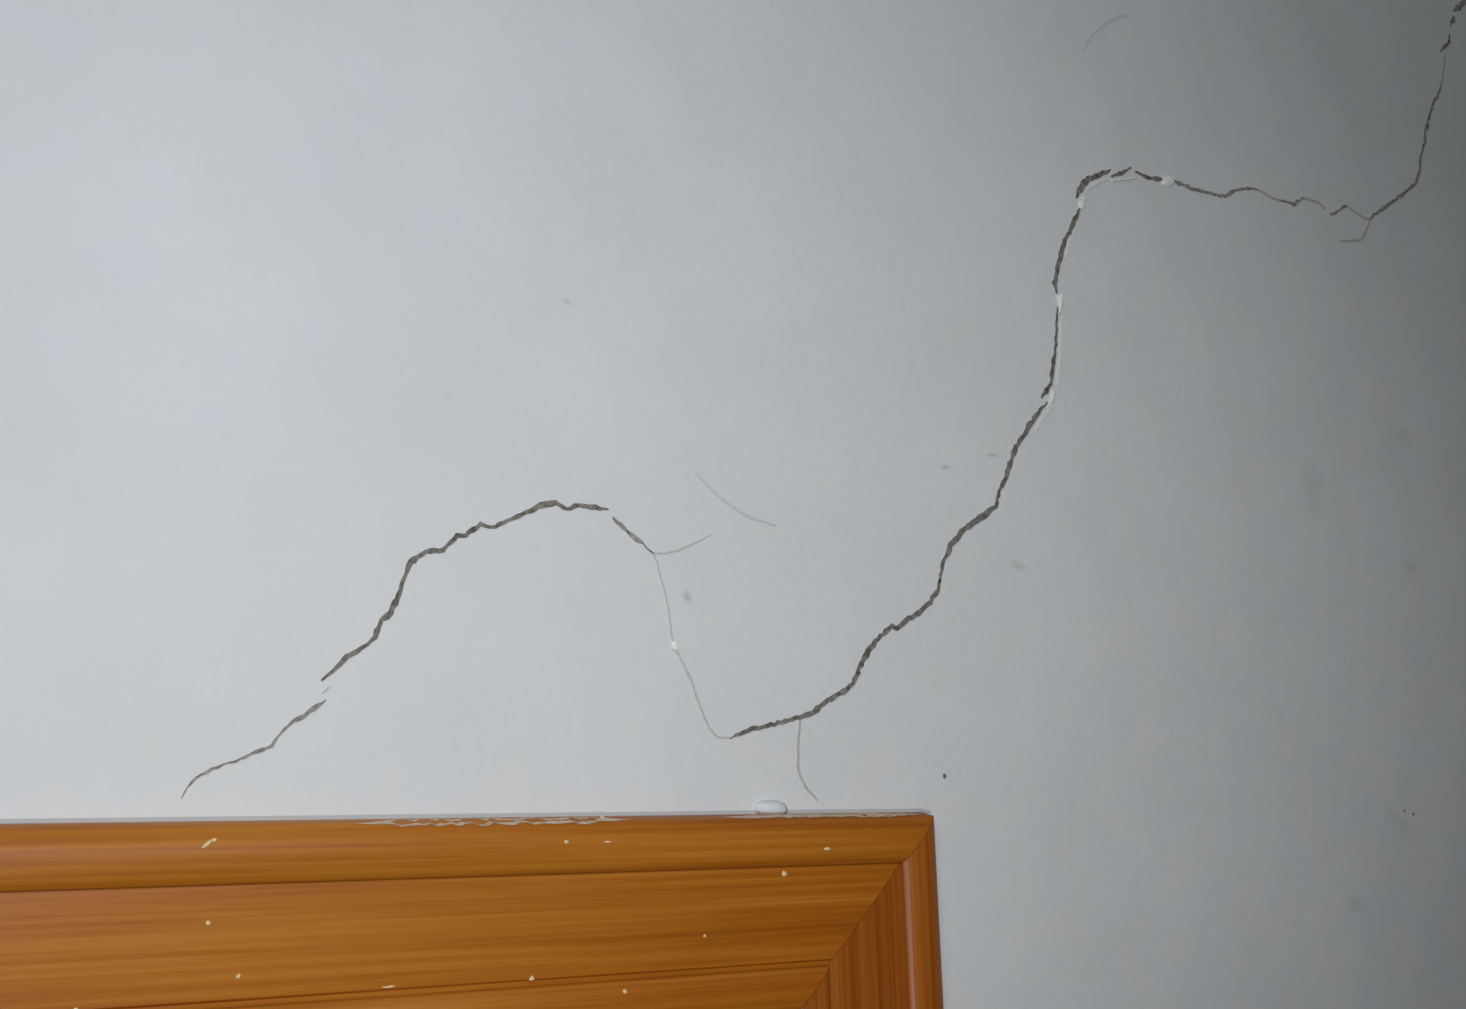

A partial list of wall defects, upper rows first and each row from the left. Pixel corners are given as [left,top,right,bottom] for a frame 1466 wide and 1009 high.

crack [181,0,1466,801]